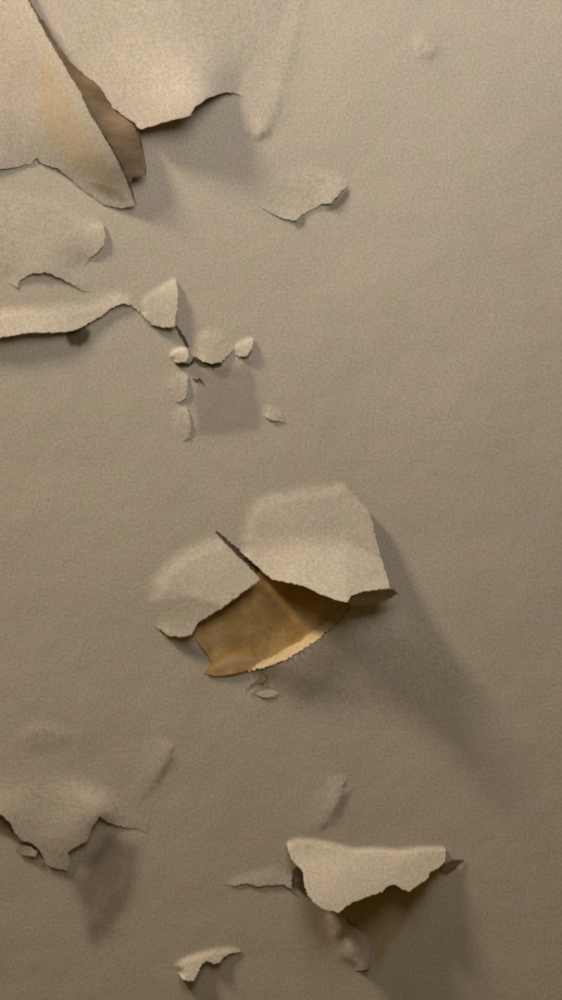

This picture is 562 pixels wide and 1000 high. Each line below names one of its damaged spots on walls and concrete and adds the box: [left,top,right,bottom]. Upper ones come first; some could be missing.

peeling [0,0,289,209]
peeling [0,184,178,352]
peeling [256,160,353,234]
spalling [162,322,284,444]
peeling [142,480,500,730]
peeling [0,766,152,962]
peeling [172,944,241,981]
peeling [222,836,464,978]